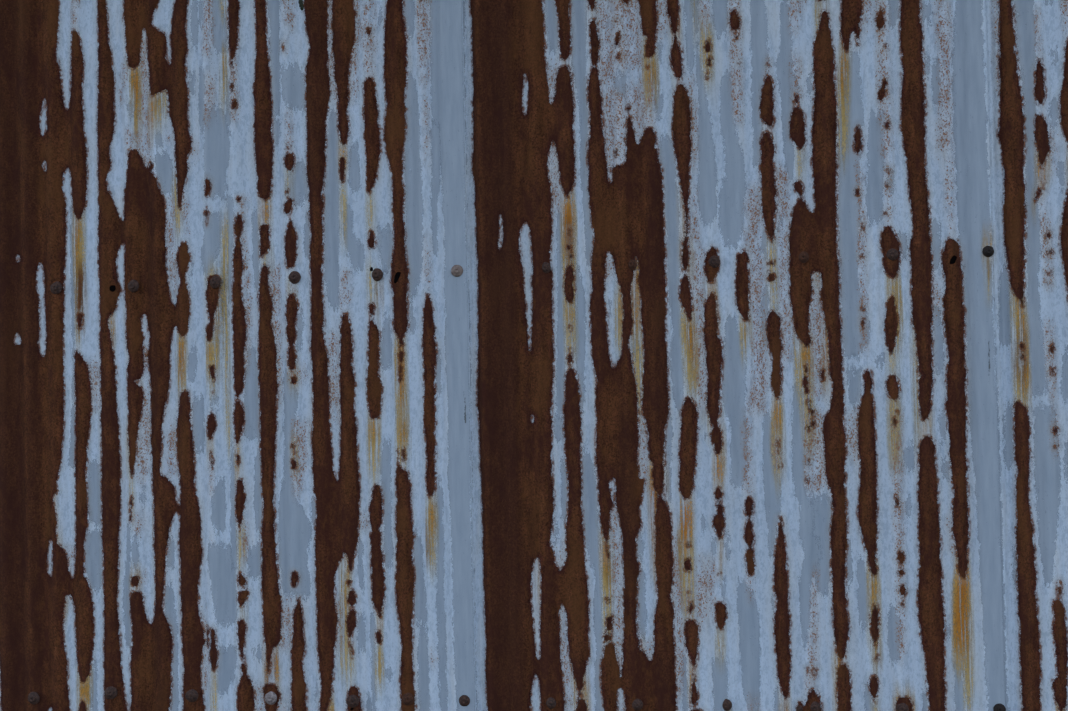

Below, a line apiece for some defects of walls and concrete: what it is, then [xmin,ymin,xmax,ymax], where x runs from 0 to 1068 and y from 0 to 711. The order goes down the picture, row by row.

corrosion [0,0,219,711]
peeling [207,347,263,628]
corrosion [202,0,438,711]
peeling [376,0,478,711]
peeling [544,0,593,443]
corrosion [469,0,728,711]
peeling [657,133,685,501]
corrosion [727,0,745,125]
corrosion [734,0,973,711]
peeling [837,51,894,410]
peeling [924,0,1017,711]
peeling [1013,0,1068,588]